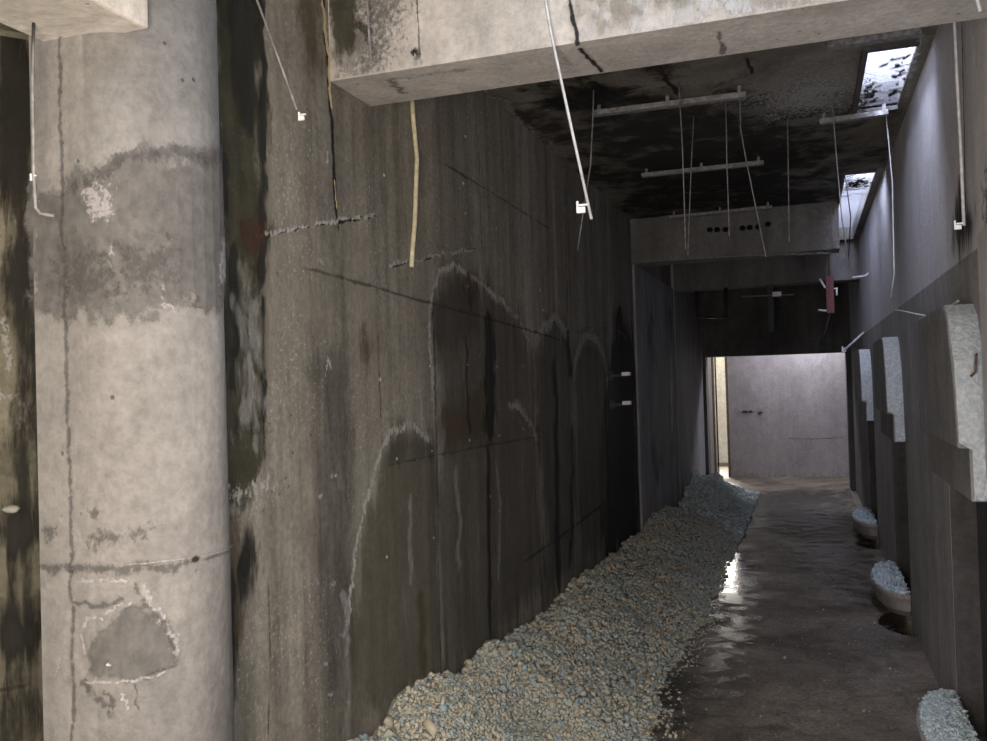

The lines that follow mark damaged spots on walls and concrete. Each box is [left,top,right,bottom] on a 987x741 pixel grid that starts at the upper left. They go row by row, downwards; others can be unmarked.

leakage [255,0,269,425]
crack [241,0,377,258]
crack [569,0,603,73]
crack [649,65,678,96]
crack [745,58,754,74]
leakage [952,175,987,261]
leakage [0,36,241,741]
spalling [74,576,180,713]
leakage [229,514,257,696]
leakage [228,469,279,506]
leakage [341,418,439,707]
leakage [426,260,640,638]